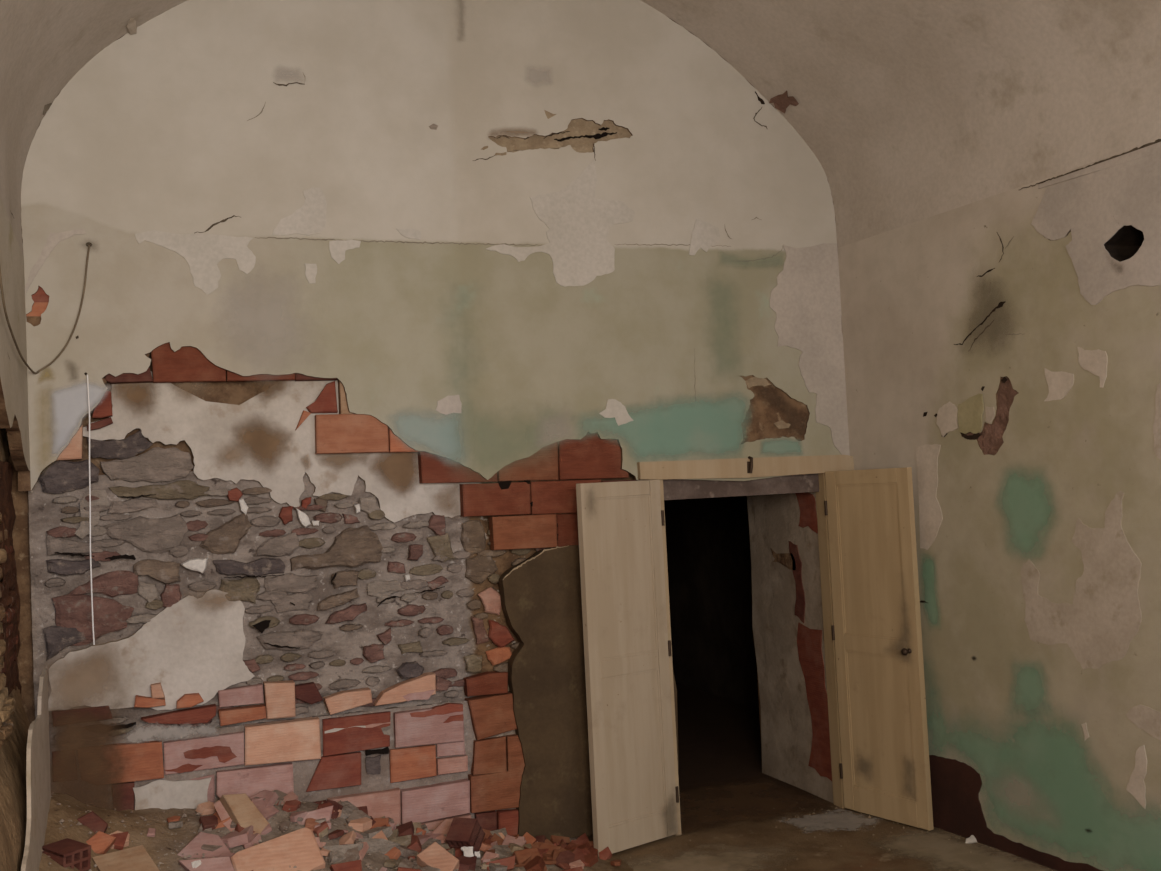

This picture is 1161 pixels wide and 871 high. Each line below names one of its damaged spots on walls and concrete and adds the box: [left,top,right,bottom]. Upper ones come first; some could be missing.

peeling [481,119,635,287]
flaking render [769,91,799,113]
crack [1020,139,1161,190]
peeling [1031,152,1161,305]
flaking render [26,286,49,326]
peeling [740,243,850,456]
flaking render [915,377,1018,550]
flaking render [0,343,637,871]
peeling [1126,745,1147,809]